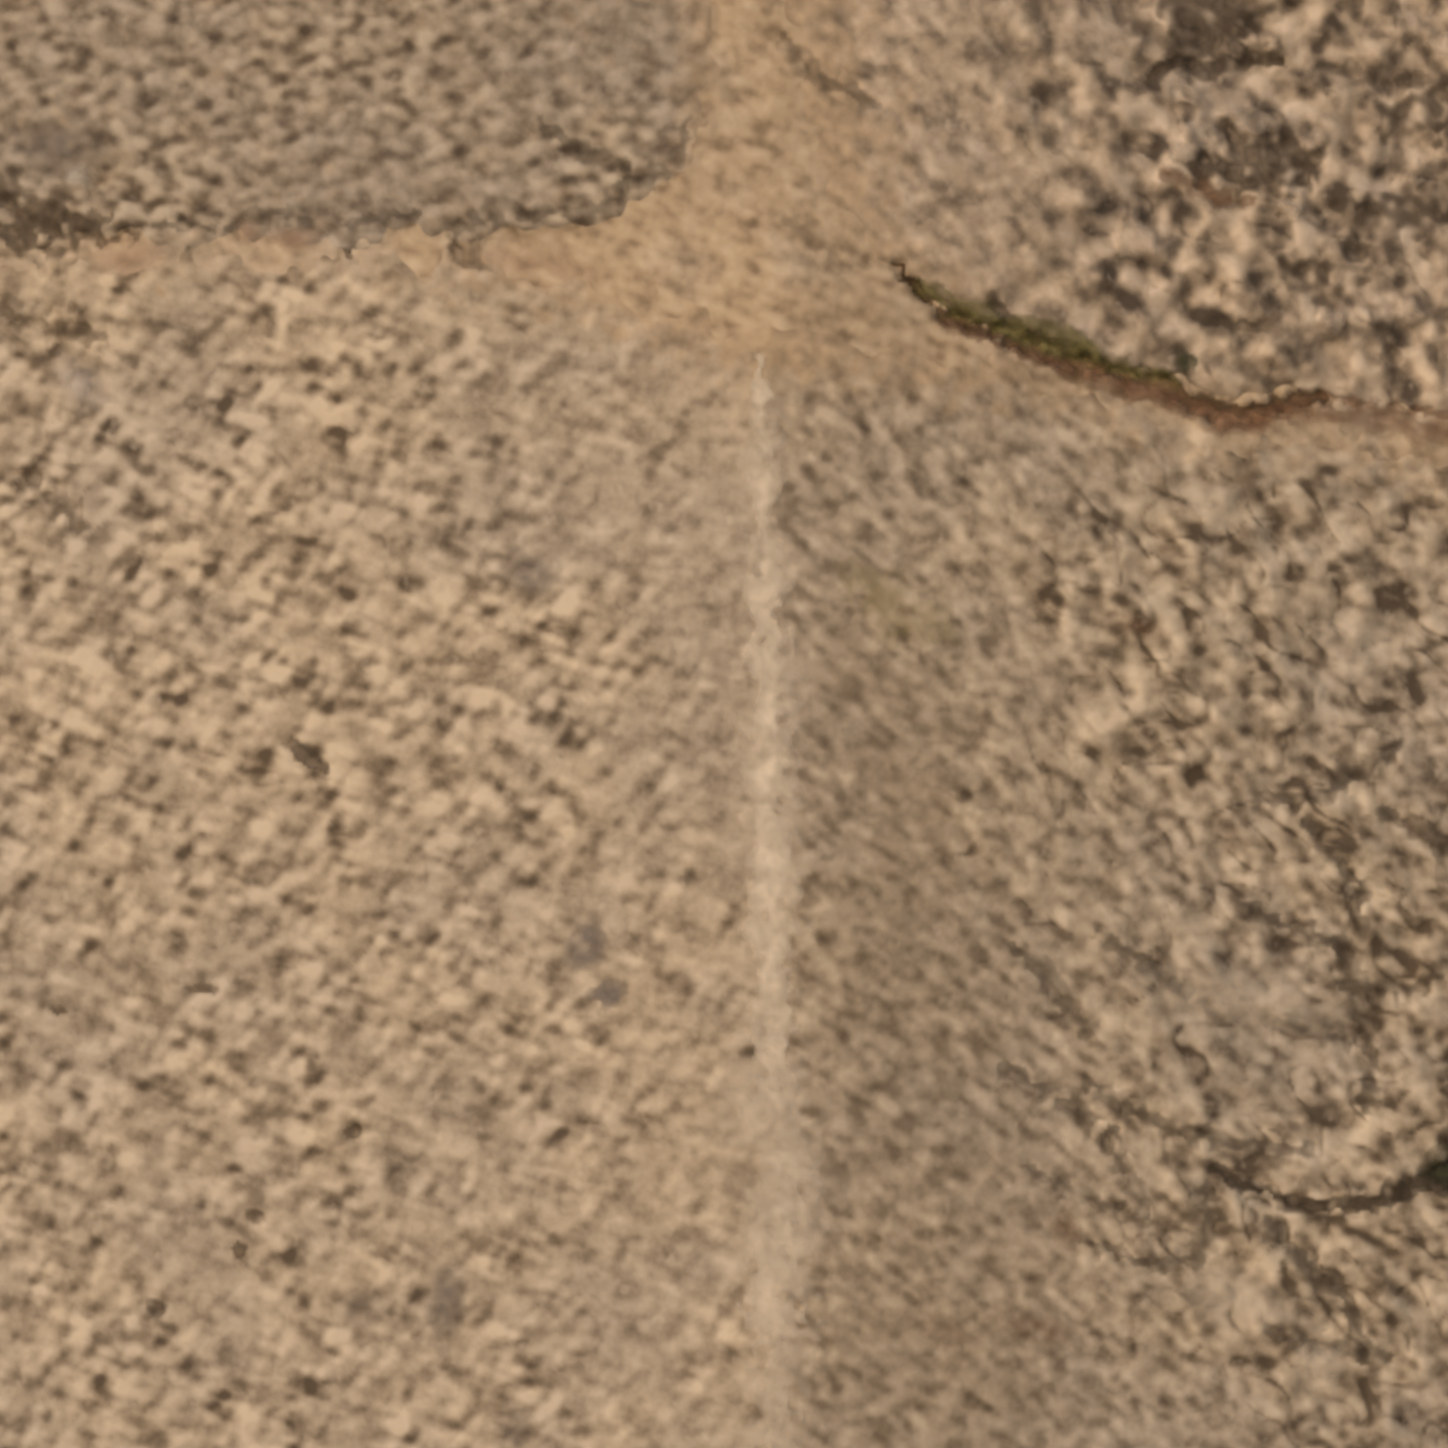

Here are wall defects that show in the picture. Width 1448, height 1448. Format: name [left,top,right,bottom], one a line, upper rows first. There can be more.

crack [892,262,1357,424]
crack [1145,1159,1448,1360]